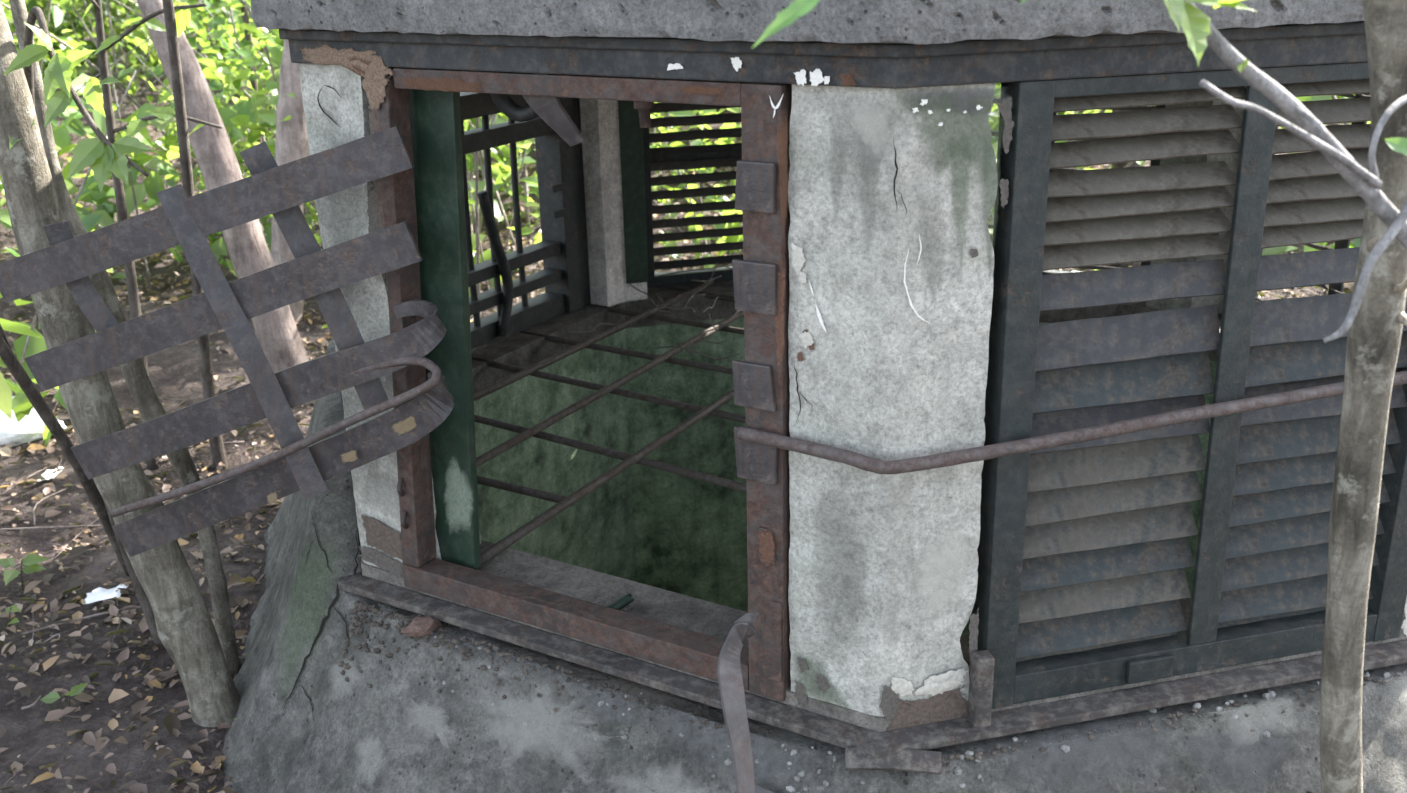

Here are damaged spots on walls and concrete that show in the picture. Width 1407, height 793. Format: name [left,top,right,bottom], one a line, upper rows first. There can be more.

spalling [301,44,393,134]
rust [401,77,479,92]
spalling [912,97,1014,154]
water stain [920,90,995,224]
spalling [367,178,384,233]
spalling [999,179,1009,208]
rust [757,530,775,565]
crack [282,513,359,722]
spalling [879,608,979,731]